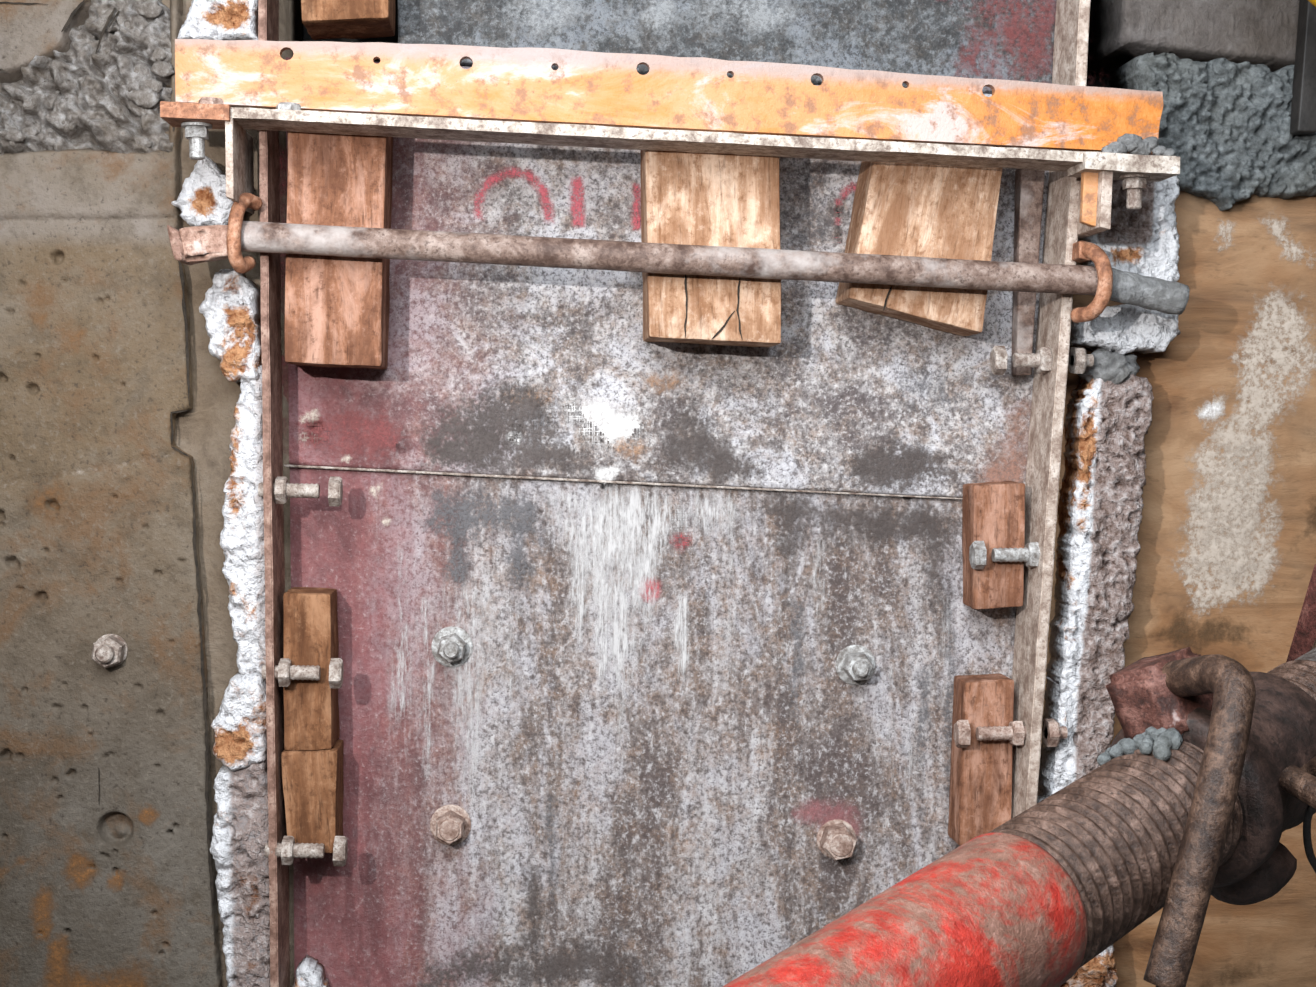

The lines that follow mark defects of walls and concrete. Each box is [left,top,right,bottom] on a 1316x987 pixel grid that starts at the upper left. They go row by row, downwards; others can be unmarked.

spalling [0,0,175,155]
crack [170,261,215,945]